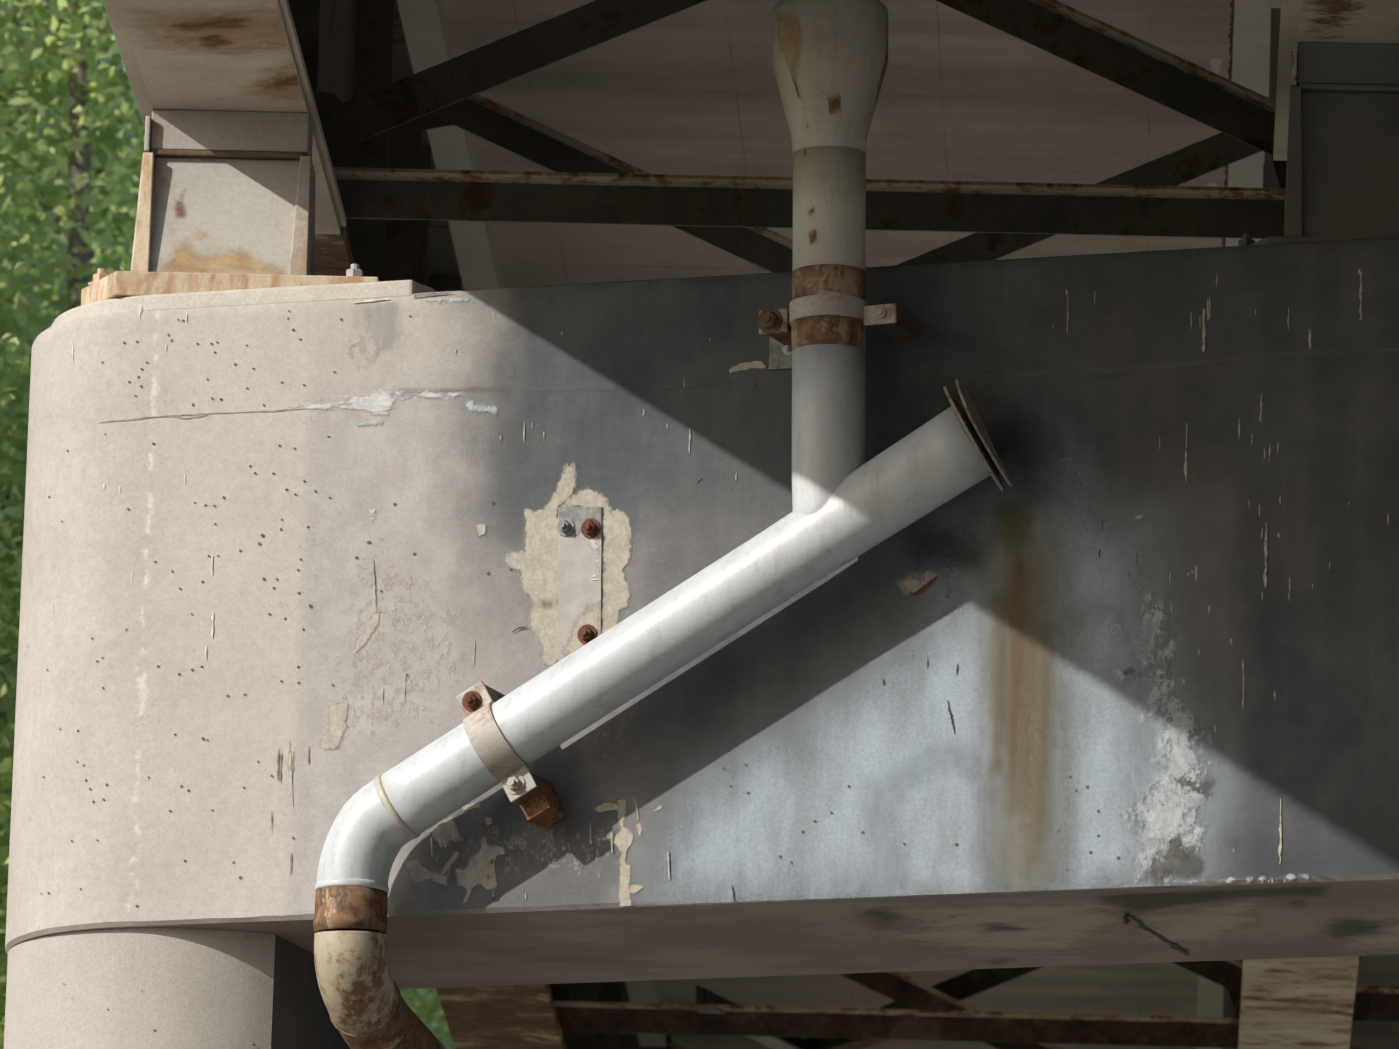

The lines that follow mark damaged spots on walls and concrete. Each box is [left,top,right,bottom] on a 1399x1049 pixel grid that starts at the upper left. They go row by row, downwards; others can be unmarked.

rust [159,10,302,98]
rust [171,248,270,271]
crack [100,408,303,423]
peeling [505,463,632,666]
spalling [902,572,940,597]
water stain [659,446,1215,903]
rust [995,511,1053,877]
peeling [405,801,505,903]
peeling [589,797,662,906]